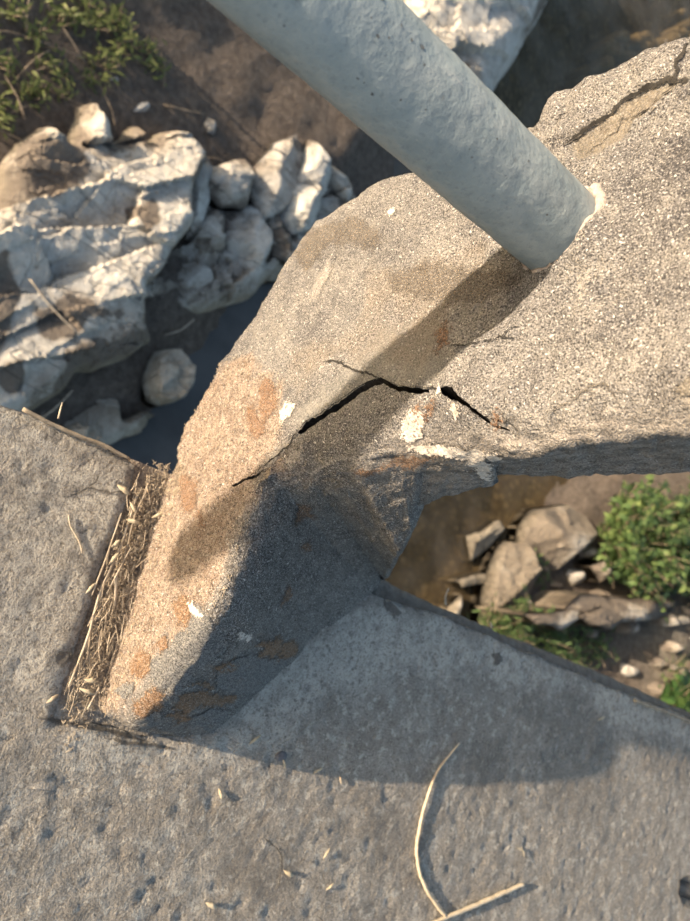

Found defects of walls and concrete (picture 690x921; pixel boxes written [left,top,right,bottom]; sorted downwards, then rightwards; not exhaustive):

crack [562,42,690,145]
crack [232,359,516,487]
corrosion [130,635,168,681]
corrosion [131,686,193,726]